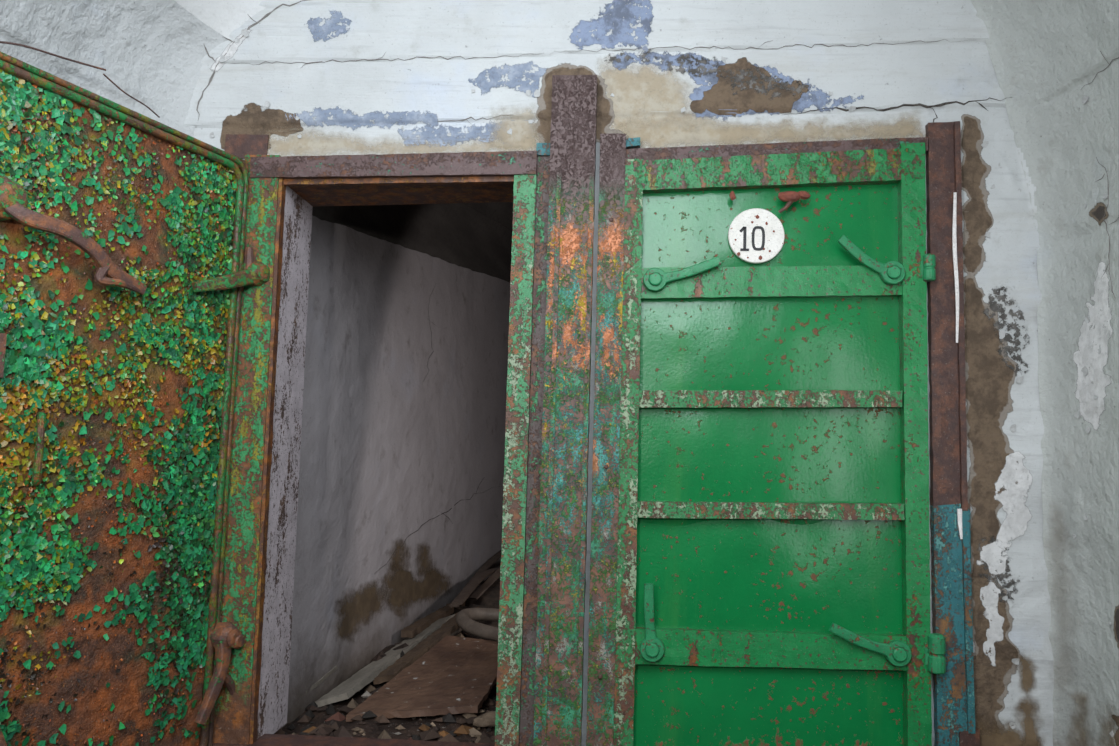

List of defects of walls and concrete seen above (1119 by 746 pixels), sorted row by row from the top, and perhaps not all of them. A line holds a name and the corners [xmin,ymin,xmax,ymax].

flaking render [210,61,629,149]
peeling [569,0,864,121]
crack [1096,157,1119,297]
peeling [0,69,237,746]
spalling [961,114,1033,734]
damp [337,540,450,640]
corrosion [959,727,980,746]
damp [975,658,1042,746]